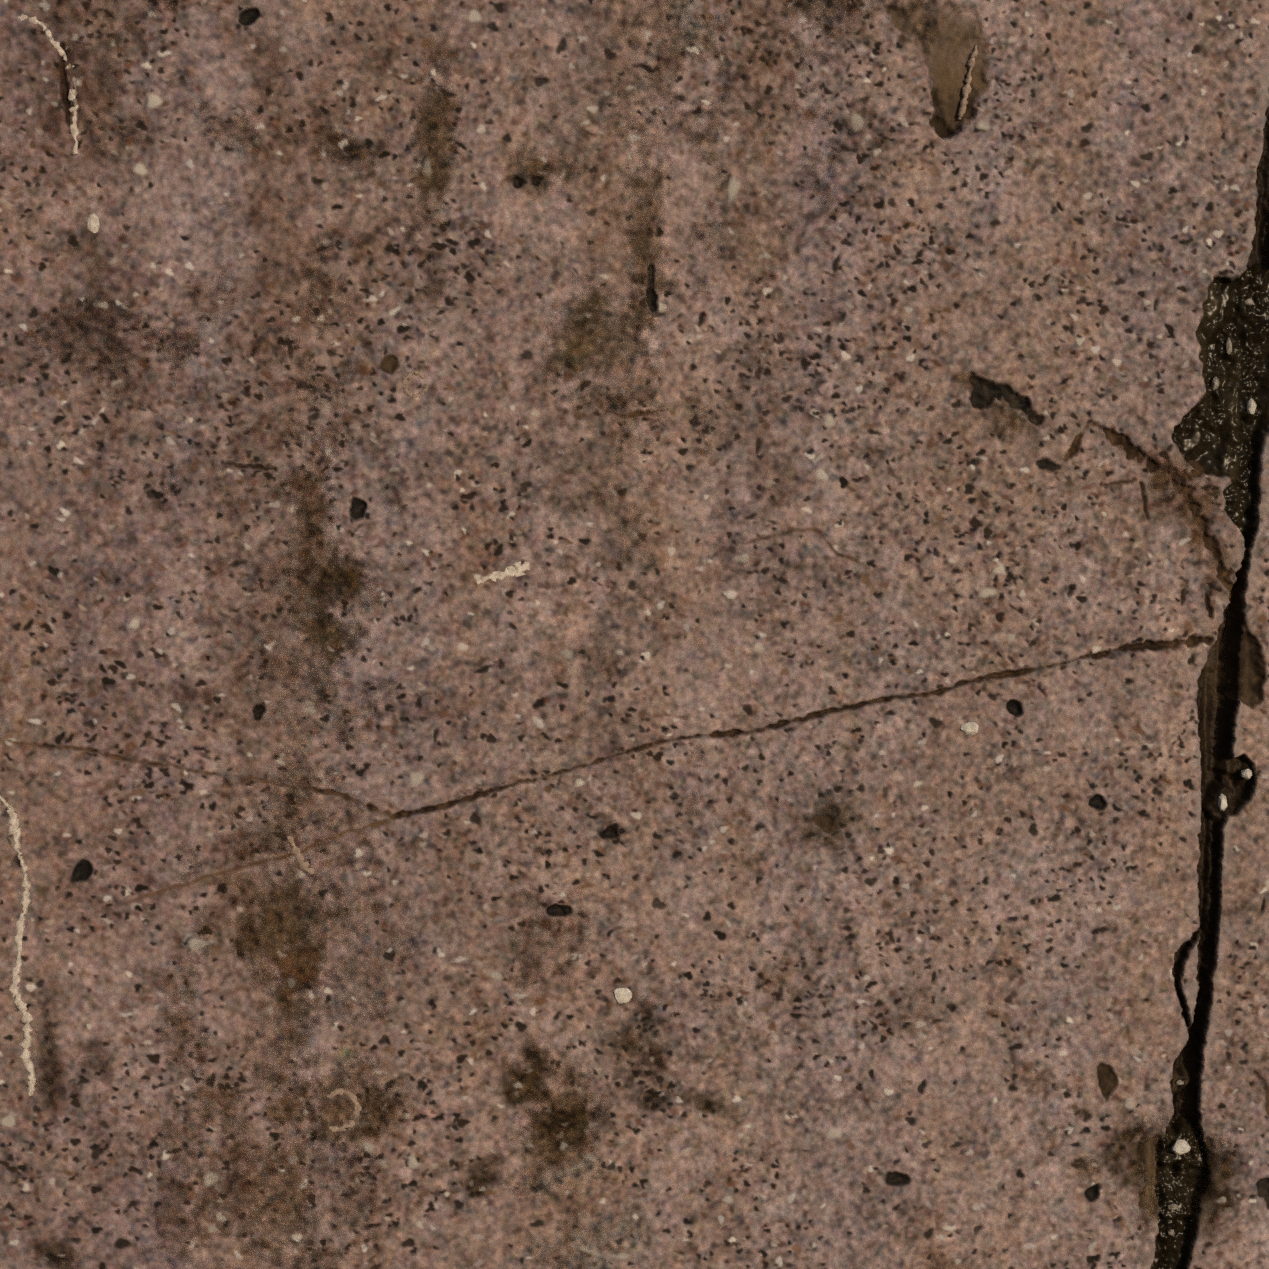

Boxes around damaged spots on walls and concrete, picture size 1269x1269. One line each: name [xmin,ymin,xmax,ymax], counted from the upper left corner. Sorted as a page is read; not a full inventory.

crack [55,39,73,129]
spalling [884,0,992,142]
crack [603,406,671,420]
spalling [959,373,1047,428]
crack [219,459,279,473]
spalling [1035,456,1062,474]
crack [741,525,877,576]
crack [1061,106,1269,1269]
crack [0,632,1217,857]
crack [117,850,295,907]